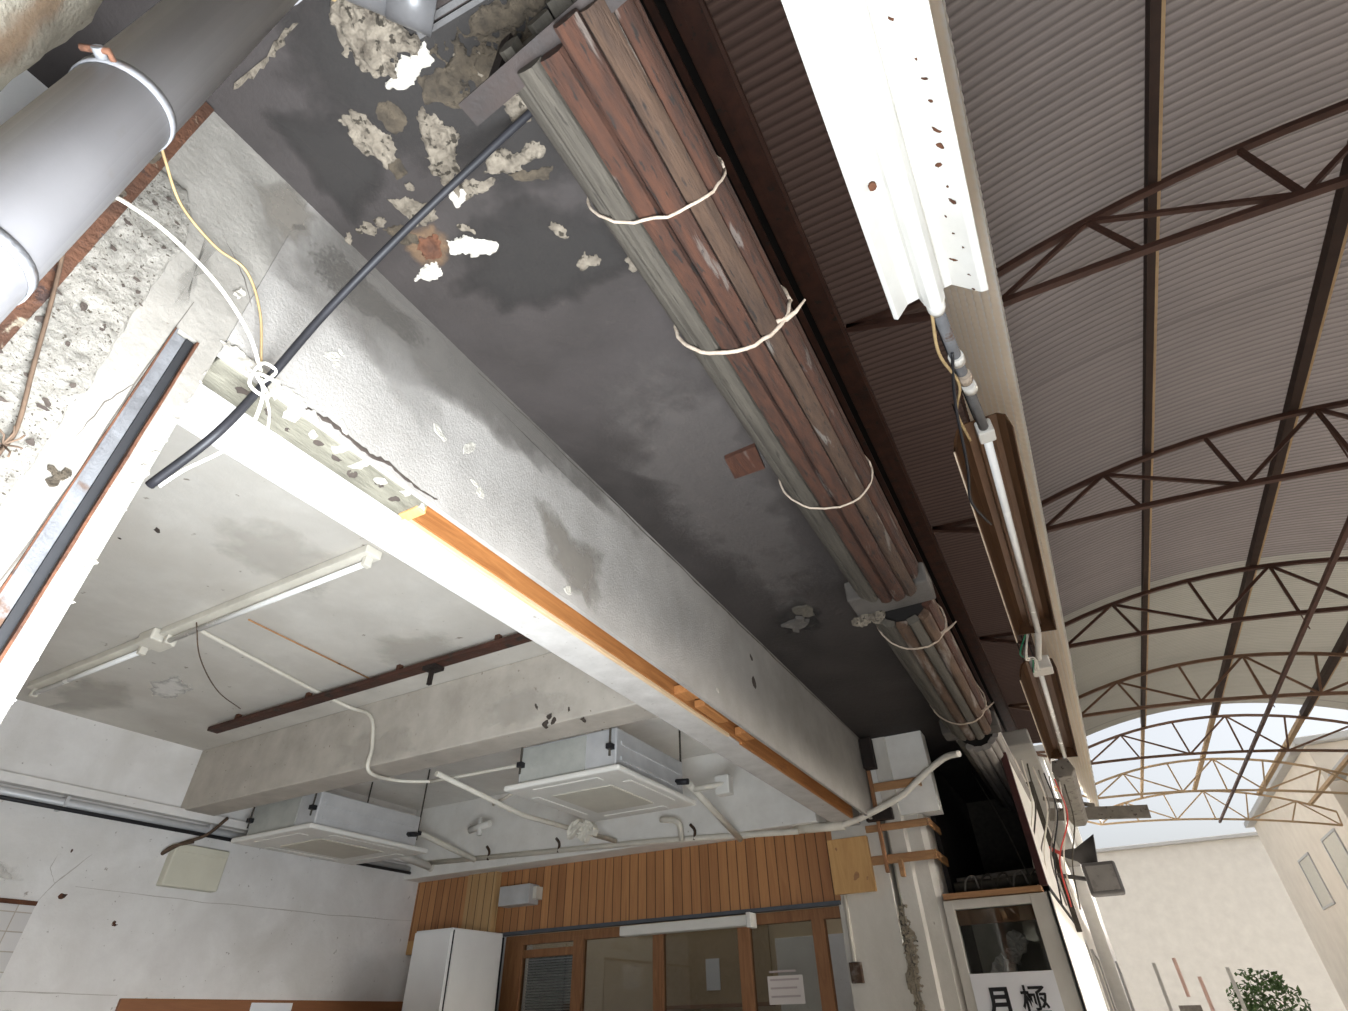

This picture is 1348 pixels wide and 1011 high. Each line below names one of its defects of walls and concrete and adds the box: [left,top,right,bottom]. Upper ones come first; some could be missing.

peeling [329,0,553,245]
peeling [414,224,499,282]
spalling [548,221,569,239]
spalling [576,251,601,271]
damp [542,506,599,602]